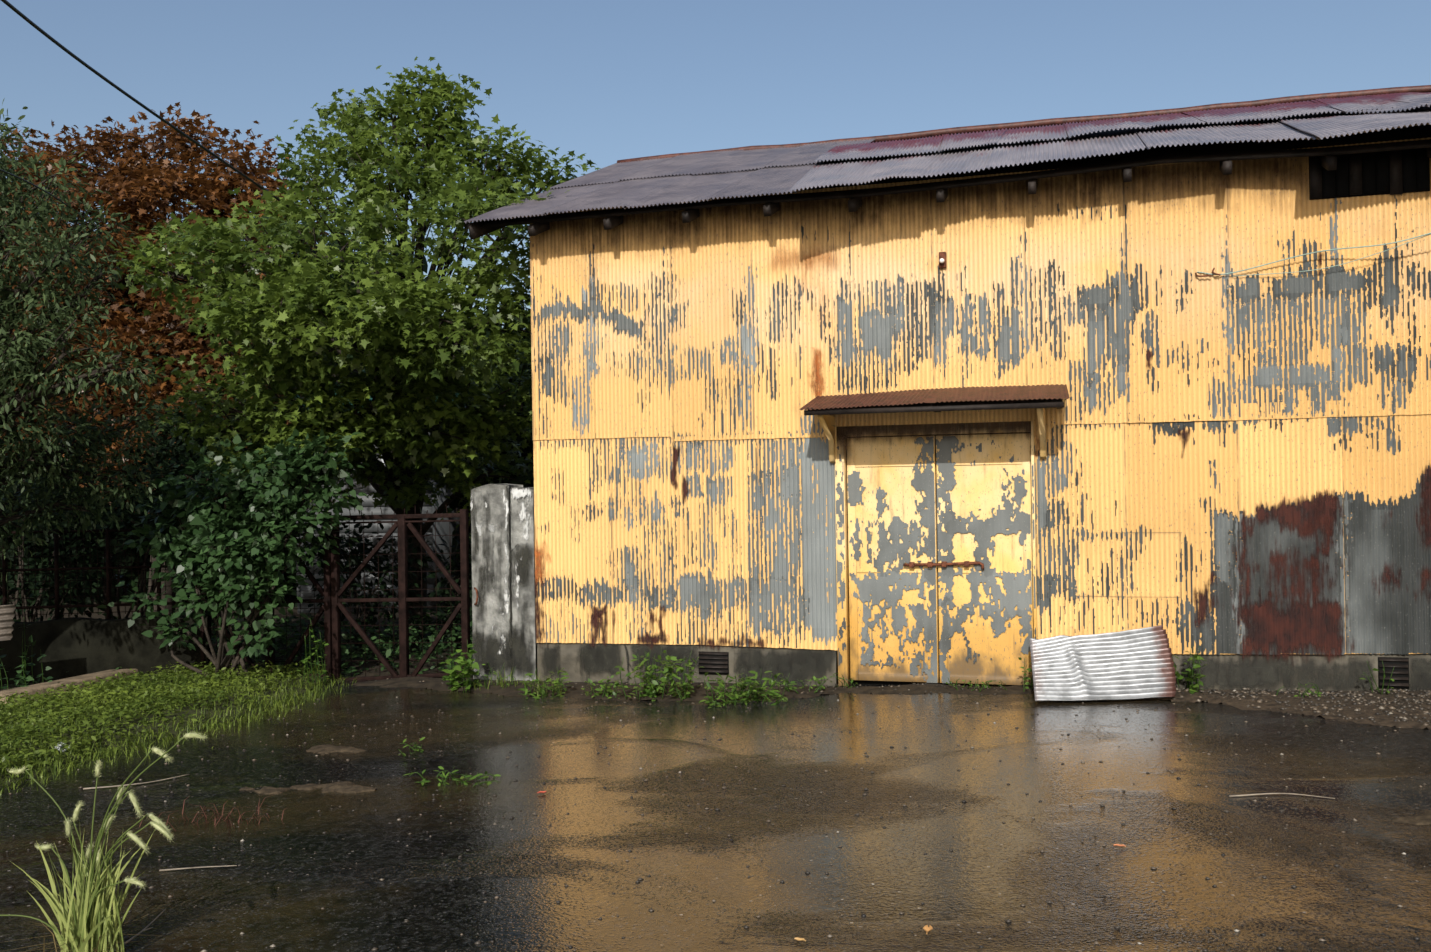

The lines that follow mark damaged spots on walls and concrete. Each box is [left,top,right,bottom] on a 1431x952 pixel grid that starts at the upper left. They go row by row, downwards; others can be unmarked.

rust [813,351,824,396]
peeling [531,194,1431,683]
rust [1420,466,1431,546]
damp [471,506,532,613]
peeling [470,488,549,654]
damp [472,602,560,678]
rust [590,605,615,646]
damp [579,643,699,683]
rust [638,605,667,648]
rust [699,635,764,650]
rust [1191,572,1216,626]
rust [1233,493,1354,662]